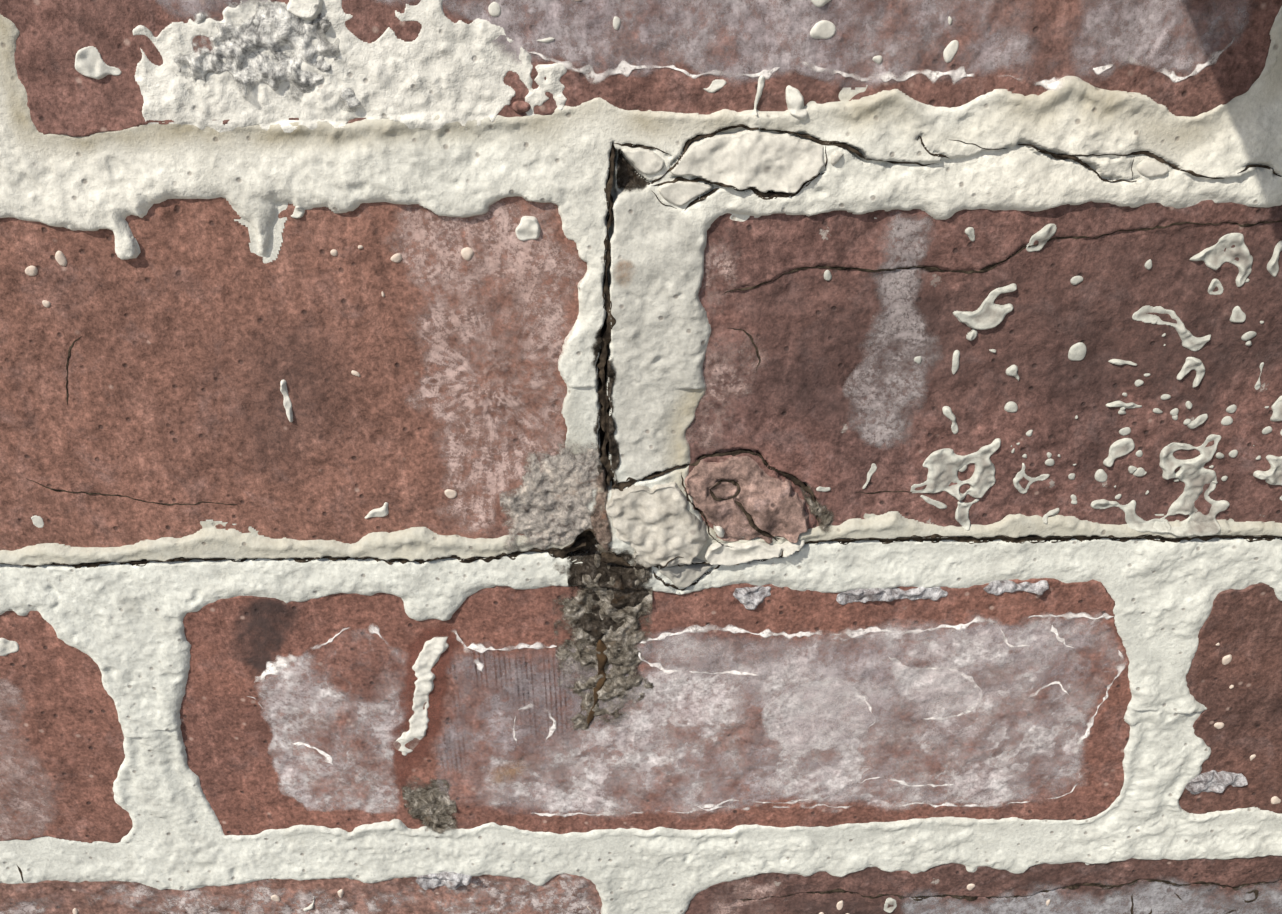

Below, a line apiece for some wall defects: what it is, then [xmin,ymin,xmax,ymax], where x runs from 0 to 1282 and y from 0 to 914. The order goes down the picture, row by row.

peeling [132,0,567,133]
crack [3,124,1282,591]
spalling [499,443,809,588]
efflorescence [248,629,406,812]
efflorescence [440,613,1124,817]